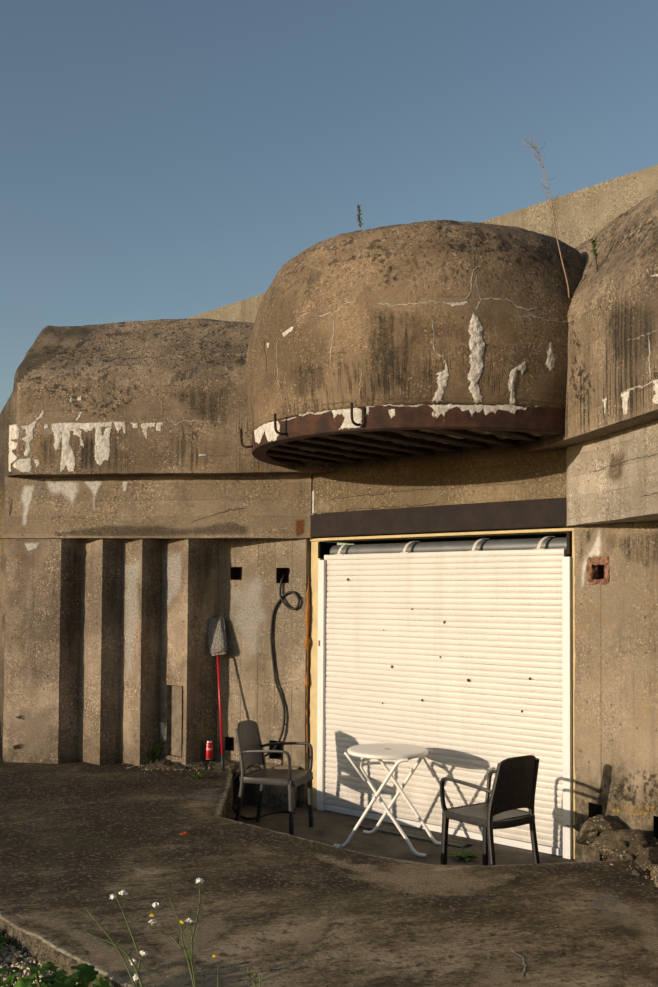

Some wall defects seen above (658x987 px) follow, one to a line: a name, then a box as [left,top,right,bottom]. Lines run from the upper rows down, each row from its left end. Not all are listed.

leakage [254,312,541,444]
crack [264,264,570,406]
leakage [572,321,607,413]
leakage [609,313,658,415]
crack [626,330,658,376]
leakage [115,563,138,670]
leakage [58,522,245,536]
leakage [165,556,181,603]